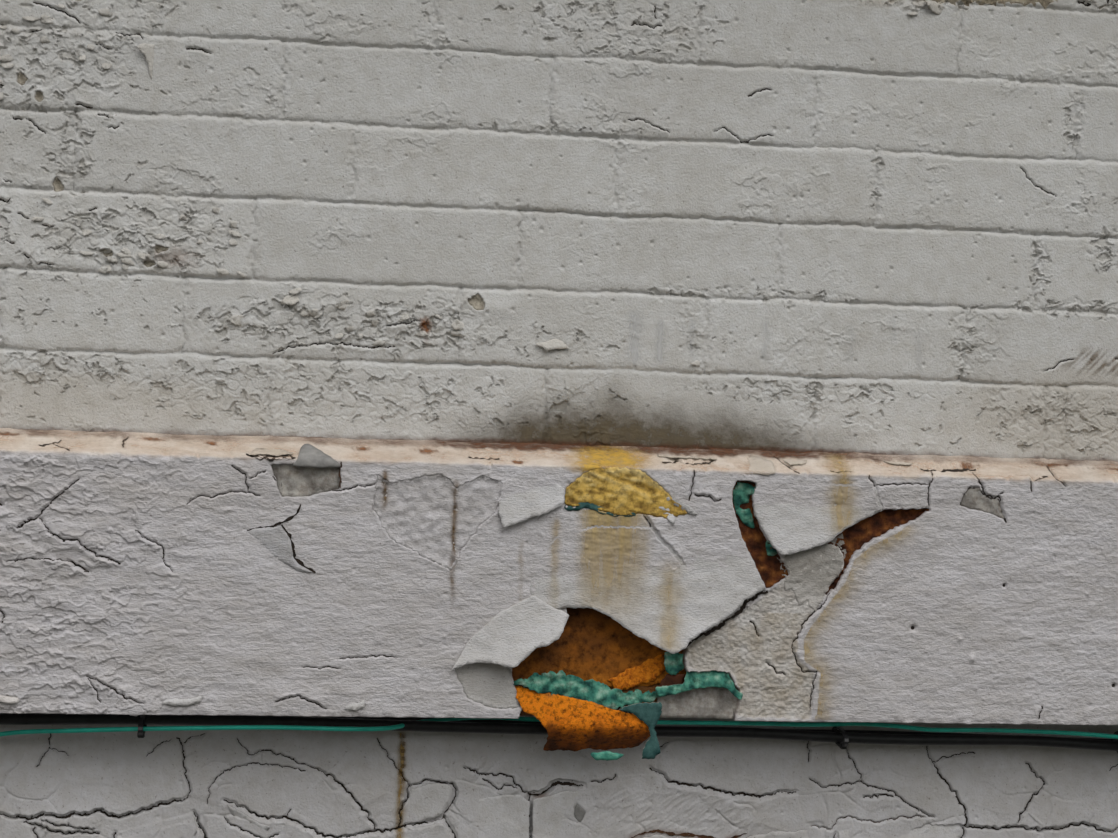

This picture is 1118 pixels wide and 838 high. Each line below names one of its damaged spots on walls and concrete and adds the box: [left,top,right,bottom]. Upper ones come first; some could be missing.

crack [0,479,121,572]
crack [187,465,277,504]
peeling [246,444,342,573]
corrosion [585,510,637,584]
peeling [373,455,929,761]
crack [86,676,144,704]
crack [275,695,326,709]
crack [303,655,393,669]
crack [0,733,616,838]
corrosion [397,733,405,838]
crack [649,741,934,838]
crack [926,746,1117,838]